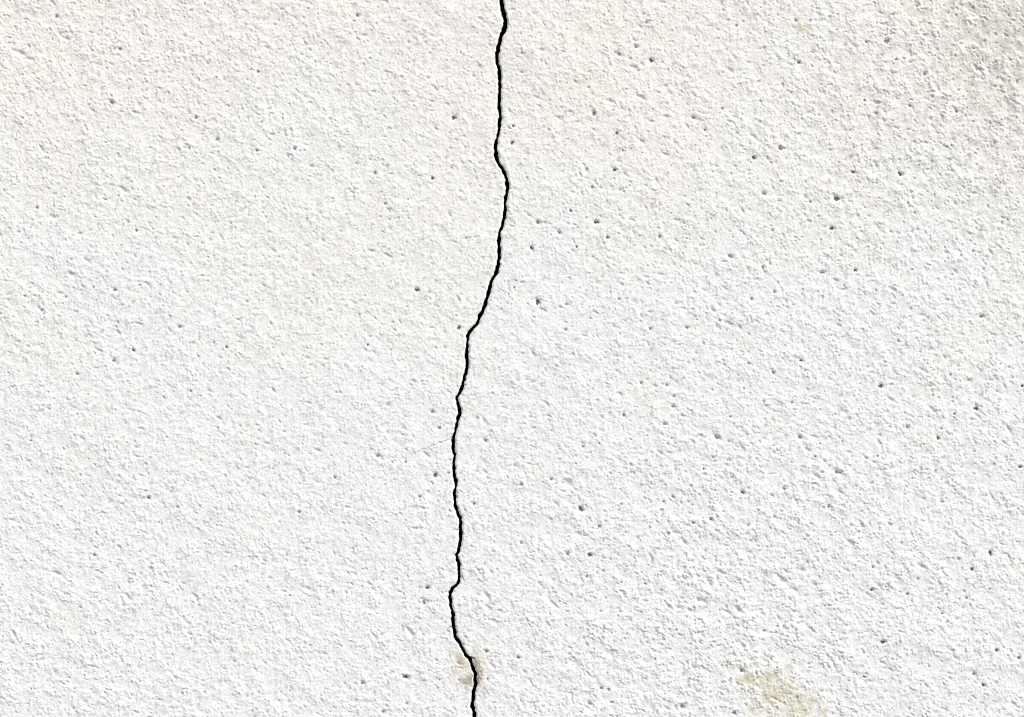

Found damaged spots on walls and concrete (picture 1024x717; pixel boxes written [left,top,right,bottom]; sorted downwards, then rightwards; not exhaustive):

crack [417,0,513,717]